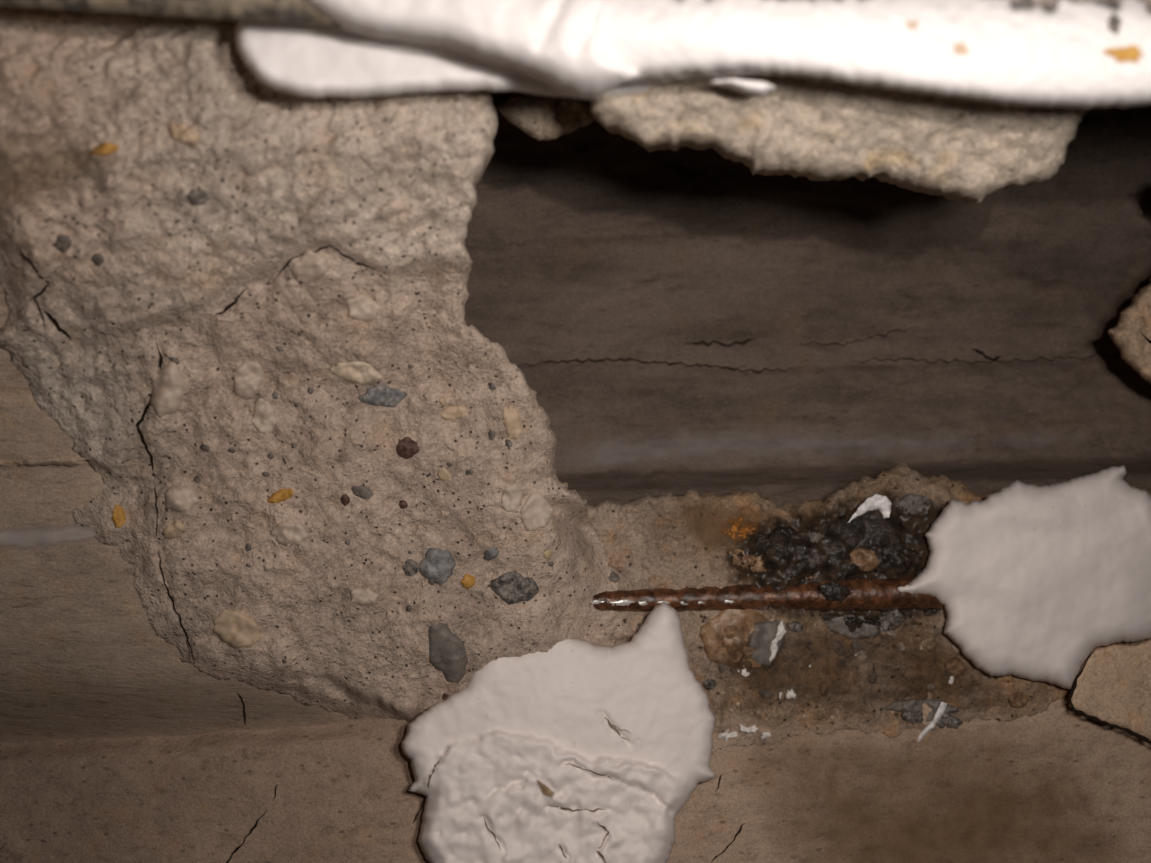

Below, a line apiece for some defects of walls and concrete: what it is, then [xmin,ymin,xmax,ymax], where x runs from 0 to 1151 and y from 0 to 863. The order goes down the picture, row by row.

spalling [591,74,1089,205]
spalling [0,6,989,723]
crack [517,326,1121,373]
spalling [1108,278,1151,384]
crack [136,343,195,665]
rust [705,492,981,704]
spalling [677,608,1075,753]
crack [1068,651,1151,744]
spalling [1082,639,1151,666]